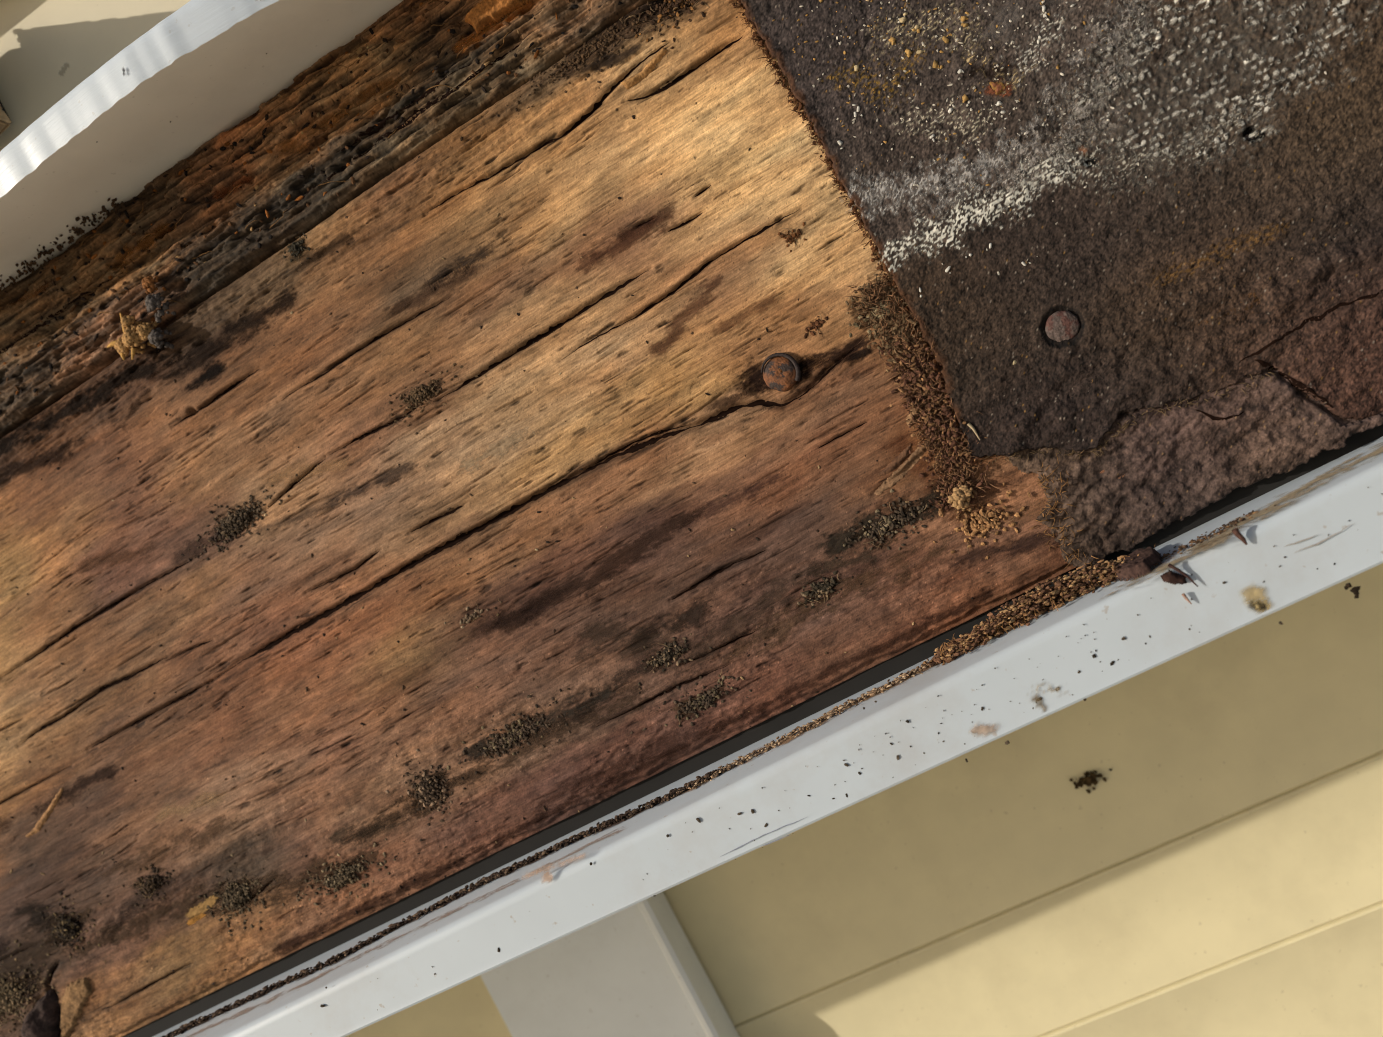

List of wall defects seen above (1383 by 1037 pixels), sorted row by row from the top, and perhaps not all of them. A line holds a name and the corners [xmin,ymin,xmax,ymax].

damp [0,289,296,485]
crack [278,31,534,219]
crack [270,210,798,507]
crack [426,37,742,214]
damp [584,45,640,71]
damp [582,207,673,273]
crack [635,185,711,232]
damp [652,279,718,353]
rust [712,335,868,410]
damp [827,0,1365,272]
damp [328,463,413,508]
crack [0,343,865,804]